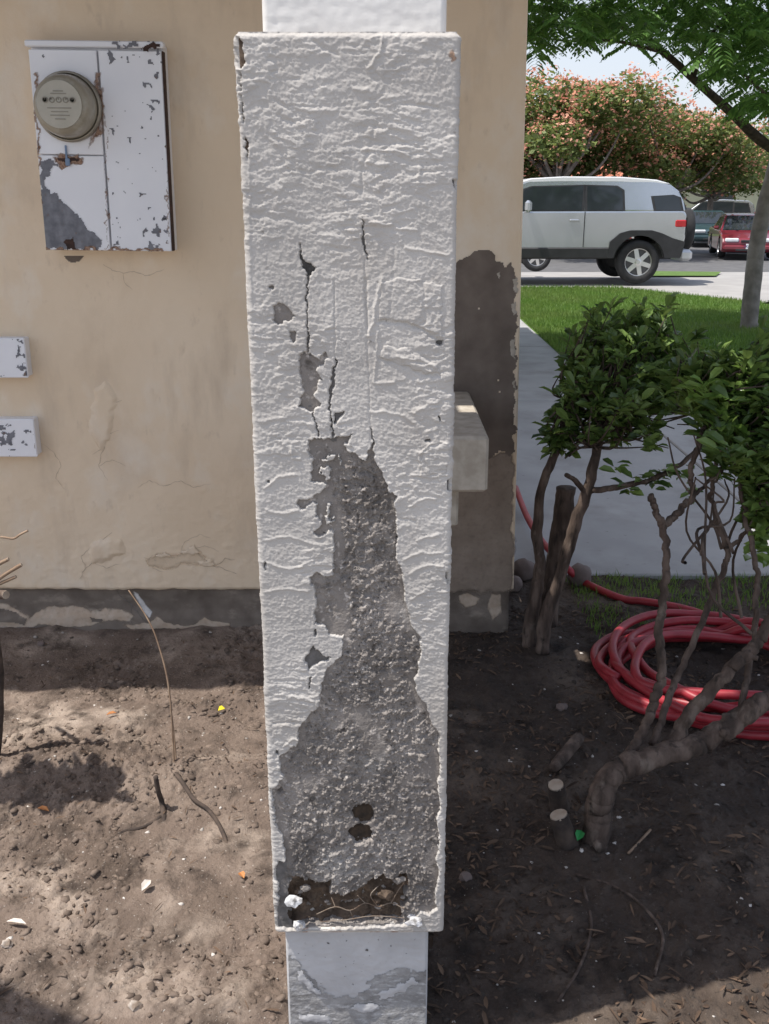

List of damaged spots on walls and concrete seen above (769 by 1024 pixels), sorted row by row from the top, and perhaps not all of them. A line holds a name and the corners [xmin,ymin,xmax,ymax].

peeling [274,303,296,342]
peeling [299,346,327,415]
crack [300,244,344,442]
peeling [453,250,519,459]
peeling [0,592,230,629]
spalling [272,435,440,928]